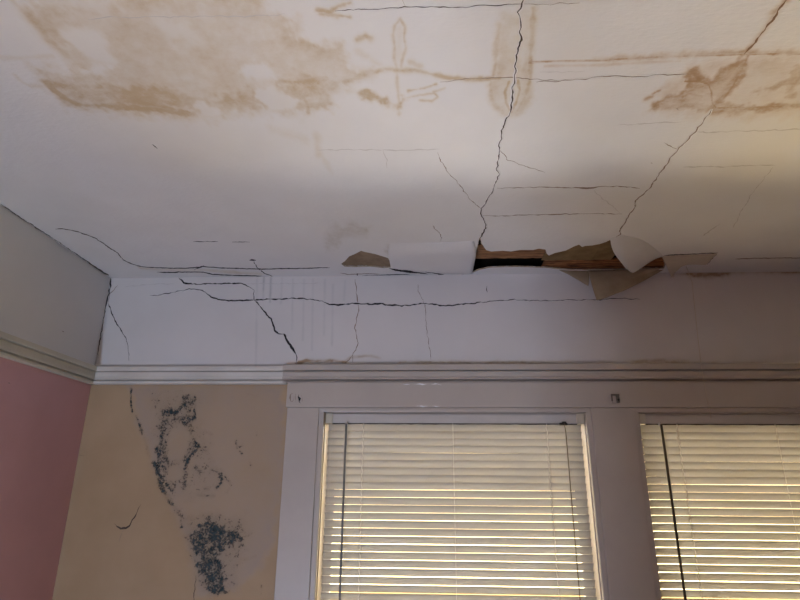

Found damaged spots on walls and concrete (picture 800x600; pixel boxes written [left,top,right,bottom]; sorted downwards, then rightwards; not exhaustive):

damp [0,0,542,176]
crack [327,0,800,263]
crack [1,204,640,364]
spalling [342,251,391,268]
spalling [473,236,716,300]
damp [124,385,287,600]